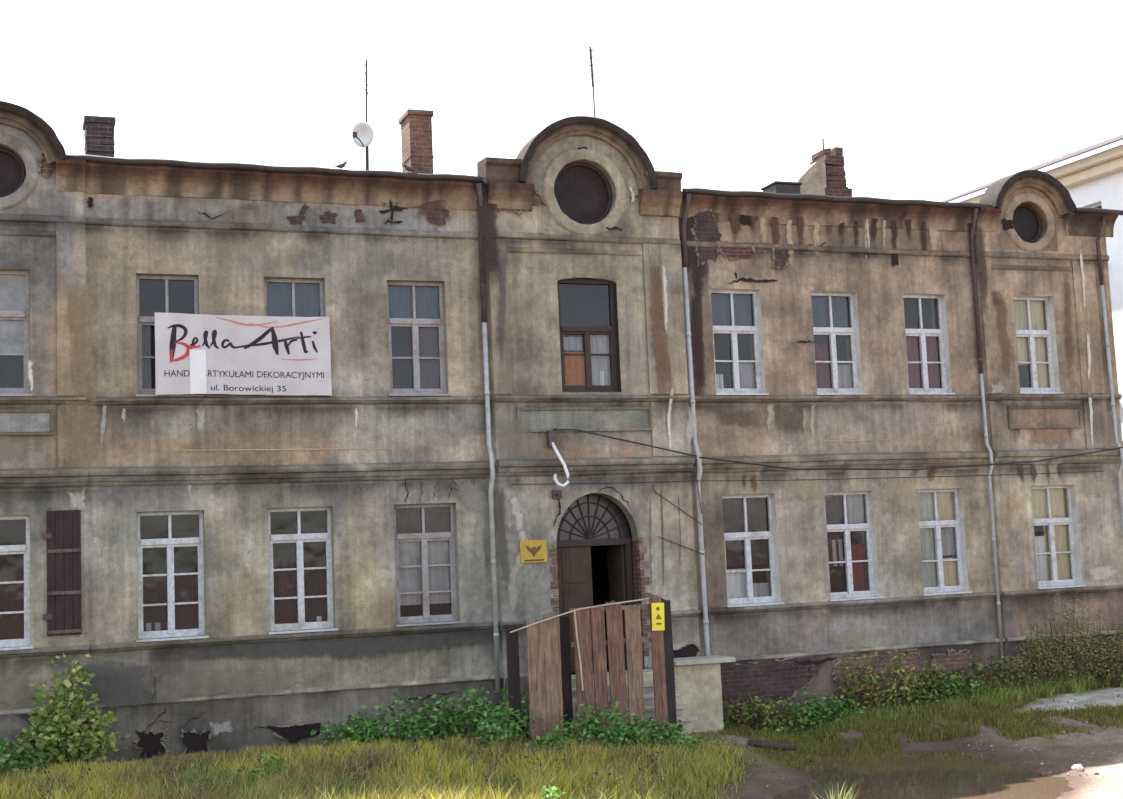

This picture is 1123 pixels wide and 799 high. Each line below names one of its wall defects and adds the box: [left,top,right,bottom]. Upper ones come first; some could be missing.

spalling [287,203,309,225]
spalling [319,210,337,224]
spalling [355,209,365,223]
spalling [428,208,449,226]
spalling [690,208,755,268]
water stain [839,218,940,257]
spalling [771,245,792,270]
spalling [720,648,979,703]
spalling [133,728,213,760]
spalling [265,721,321,743]